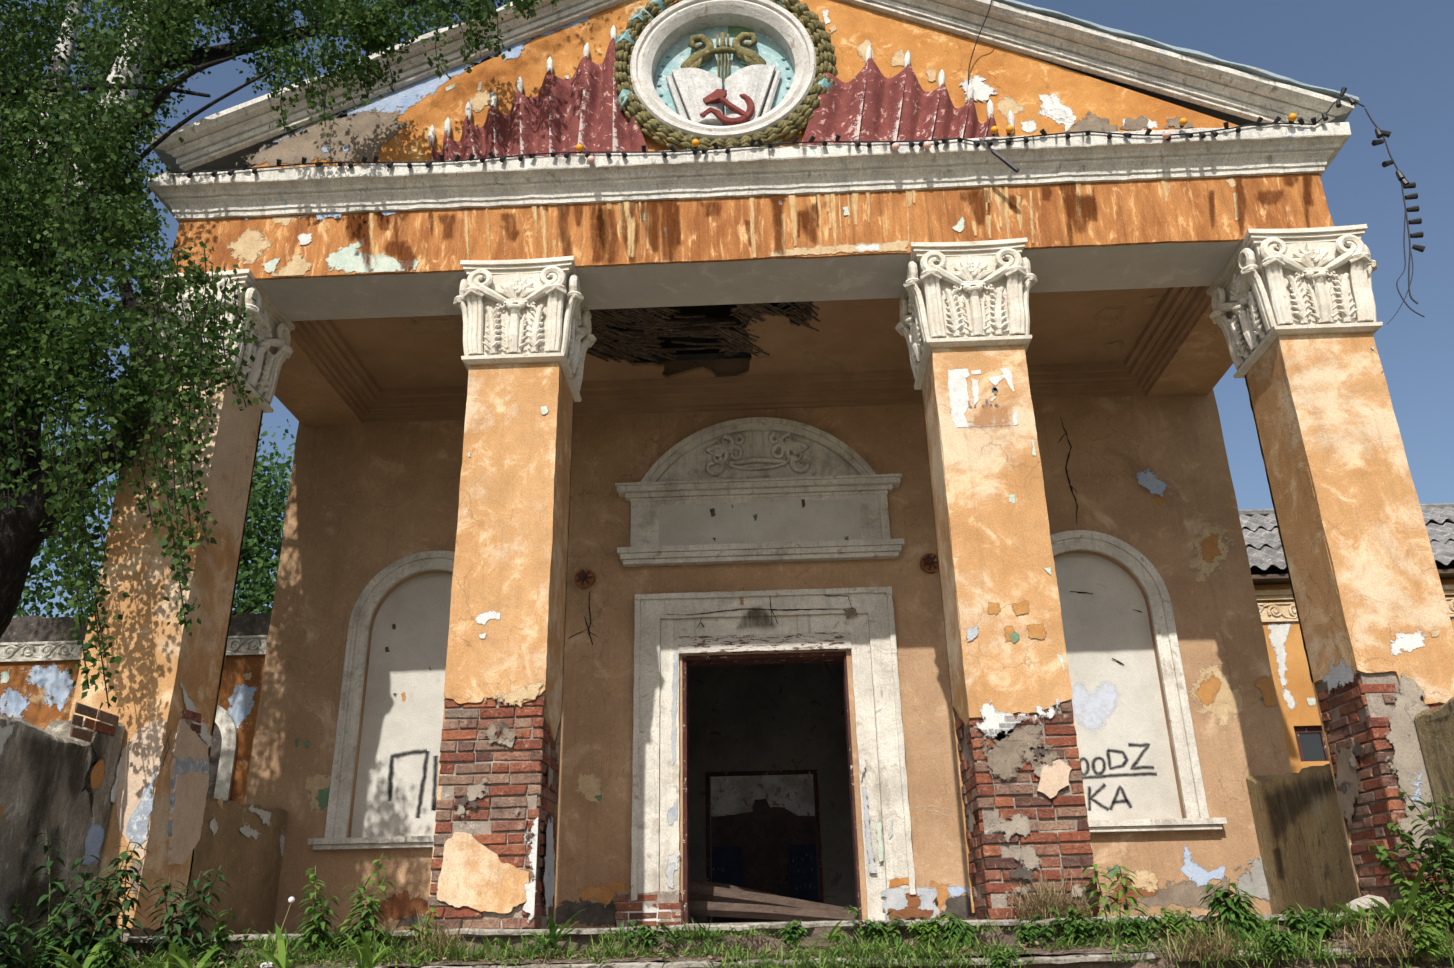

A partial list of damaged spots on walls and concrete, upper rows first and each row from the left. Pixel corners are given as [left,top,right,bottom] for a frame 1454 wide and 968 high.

peeling [235,16,590,168]
peeling [959,74,1194,134]
peeling [227,213,420,276]
damp [532,204,565,257]
damp [607,201,649,256]
damp [781,190,915,255]
damp [972,186,1034,242]
crack [1059,418,1078,523]
peeling [0,661,123,803]
spalling [395,680,682,929]
spalling [859,698,1270,920]
spalling [1188,617,1454,910]